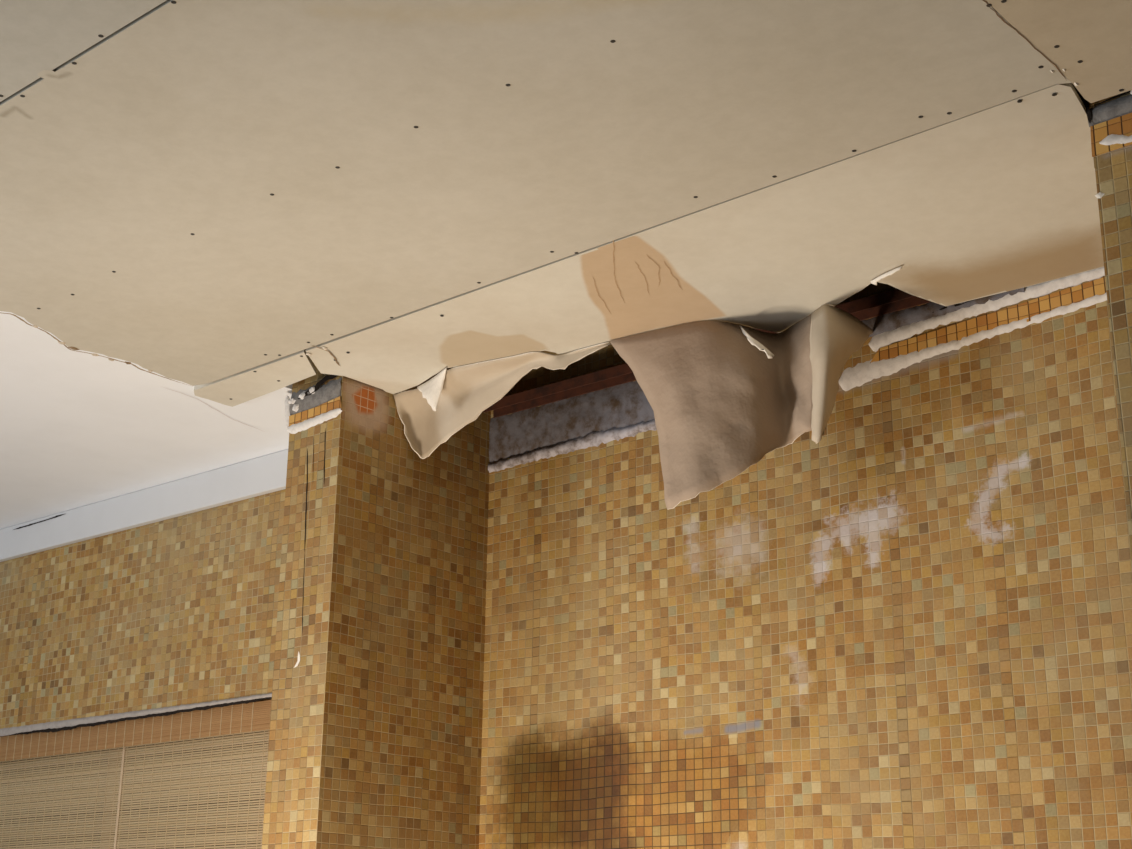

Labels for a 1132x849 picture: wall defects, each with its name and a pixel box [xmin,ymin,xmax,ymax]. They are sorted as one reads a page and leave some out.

peeling [572,234,735,342]
spalling [4,313,187,385]
peeling [430,327,556,368]
damp [958,404,1030,439]
damp [674,490,787,604]
damp [803,443,921,597]
damp [958,447,1038,556]
damp [479,629,823,849]